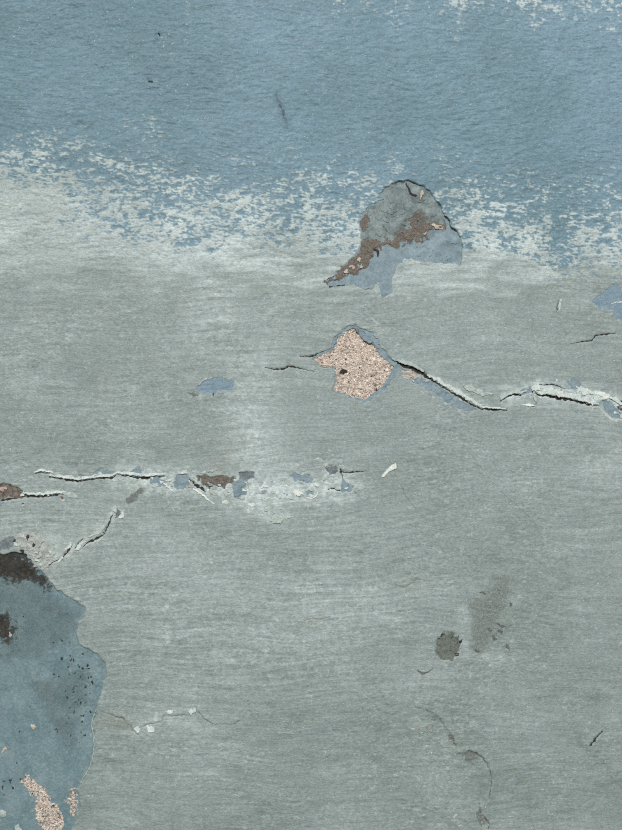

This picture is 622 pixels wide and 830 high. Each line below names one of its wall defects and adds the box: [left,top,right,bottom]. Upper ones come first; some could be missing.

peeling [323,181,461,298]
spalling [313,324,402,403]
crack [390,358,622,422]
crack [0,457,365,565]
peeling [0,530,106,830]
crack [96,708,247,736]
hole [435,632,463,661]
crack [408,700,492,829]